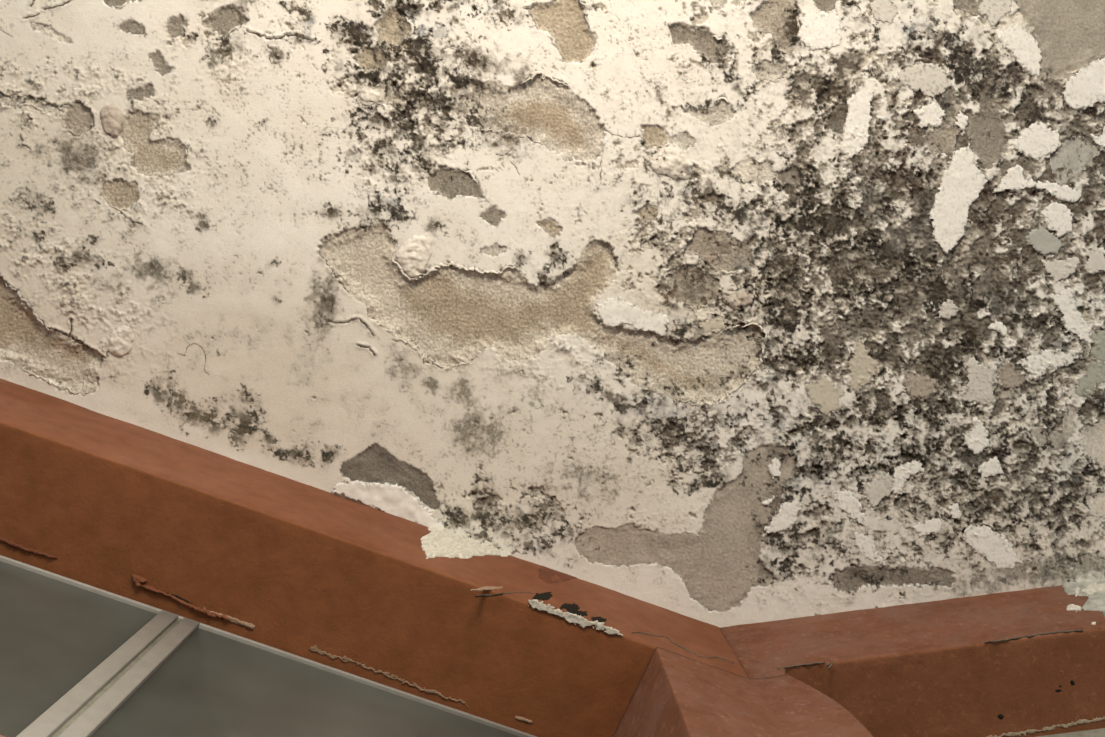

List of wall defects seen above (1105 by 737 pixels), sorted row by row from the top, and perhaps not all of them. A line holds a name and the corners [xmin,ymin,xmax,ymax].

water stain [201,34,234,63]
spalling [524,0,598,63]
spalling [953,0,1105,110]
water stain [245,0,533,234]
water stain [514,243,573,287]
spalling [320,218,768,407]
water stain [566,0,1105,596]
peeling [897,61,1105,405]
water stain [144,381,338,468]
spalling [330,443,511,559]
water stain [438,464,600,567]
spalling [575,446,802,612]